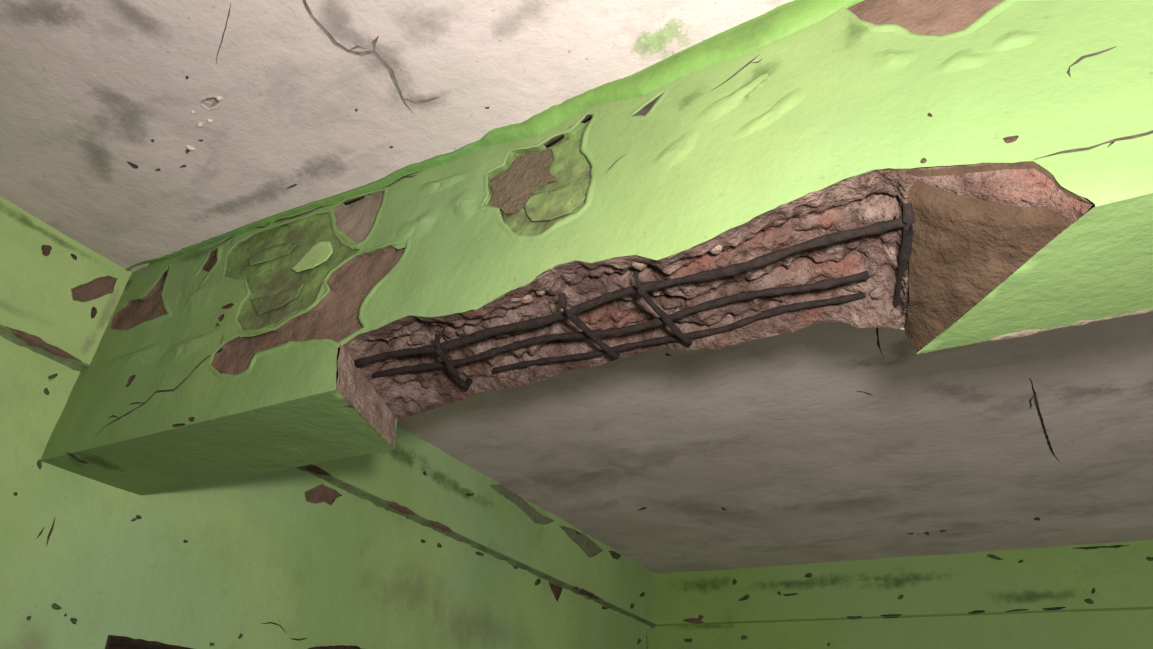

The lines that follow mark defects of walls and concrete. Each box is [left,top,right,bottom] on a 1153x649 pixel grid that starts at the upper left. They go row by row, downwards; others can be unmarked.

crack [302,0,439,113]
peeling [838,0,1045,42]
peeling [479,109,598,240]
crack [1034,130,1153,160]
peeling [68,261,172,334]
spalling [195,158,1153,449]
crack [66,452,89,464]
crack [99,327,223,433]
crack [1029,379,1059,461]
spalling [105,635,193,649]